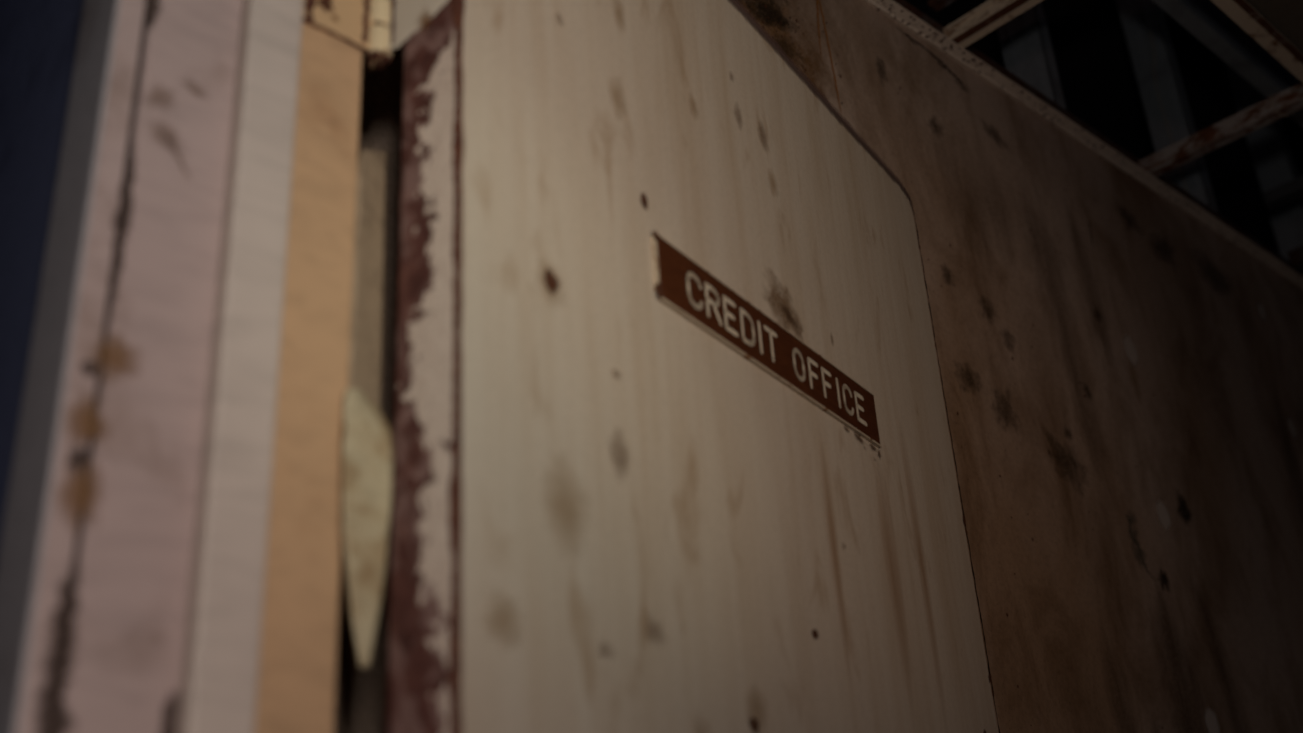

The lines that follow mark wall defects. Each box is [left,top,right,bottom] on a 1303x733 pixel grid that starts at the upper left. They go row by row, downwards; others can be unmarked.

rust [302,0,379,69]
rust [387,0,456,733]